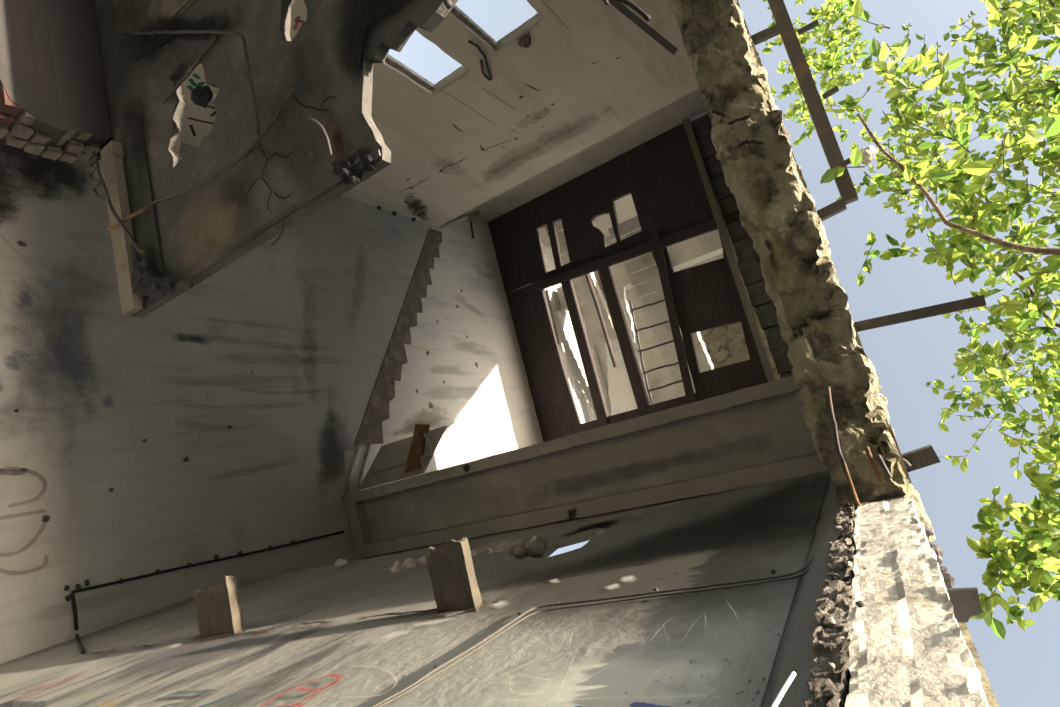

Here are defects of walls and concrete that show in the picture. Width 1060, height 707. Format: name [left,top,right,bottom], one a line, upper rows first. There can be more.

crack [293,95,337,112]
corrosion [327,119,343,163]
crack [233,143,294,247]
corrosion [826,387,861,508]
corrosion [865,446,892,482]
spalling [802,502,866,707]